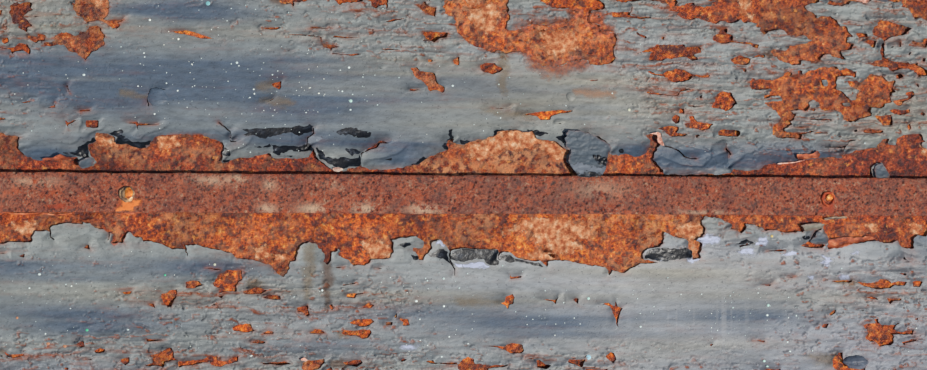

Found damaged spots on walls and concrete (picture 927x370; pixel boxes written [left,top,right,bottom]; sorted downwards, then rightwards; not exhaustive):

corrosion [9,2,33,32]
corrosion [43,0,123,60]
corrosion [417,0,651,75]
corrosion [637,44,710,83]
corrosion [651,0,927,139]
corrosion [0,130,577,176]
peeling [559,123,611,178]
peeling [718,129,740,137]
corrosion [602,116,927,179]
corrosion [0,200,927,300]
corrosion [864,319,914,346]
corrosion [426,357,508,370]